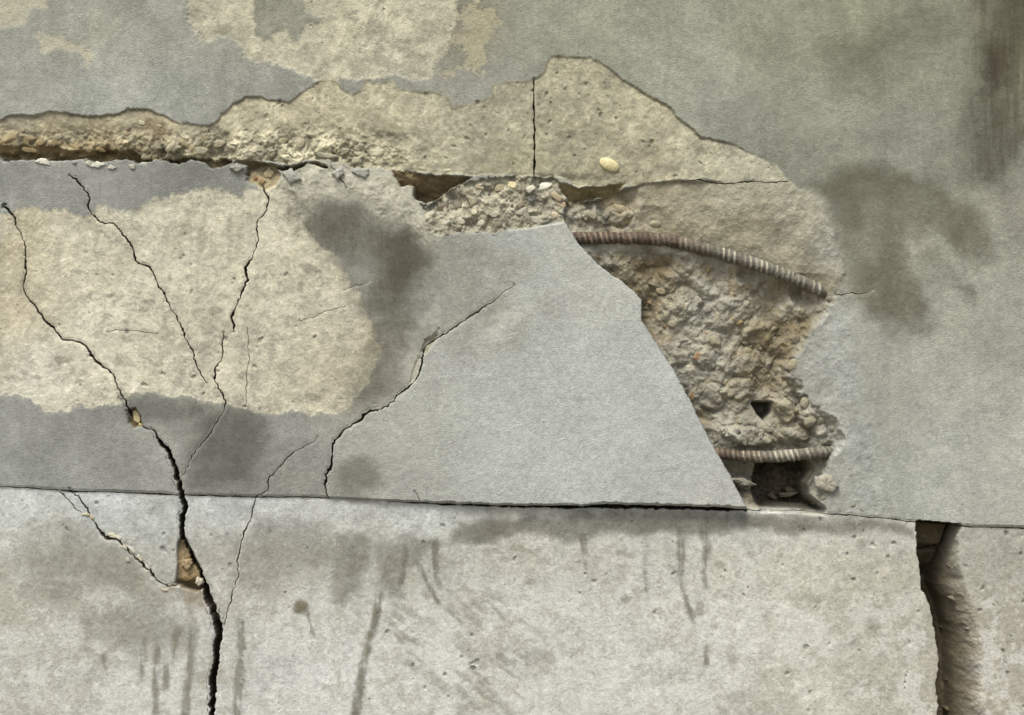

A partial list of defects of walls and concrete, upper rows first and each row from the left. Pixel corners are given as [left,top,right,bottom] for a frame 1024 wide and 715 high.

peeling [0,0,896,517]
damp [858,242,924,320]
crack [0,173,515,715]
damp [352,595,381,715]
damp [423,542,439,602]
damp [457,513,833,561]
crack [389,490,1024,715]